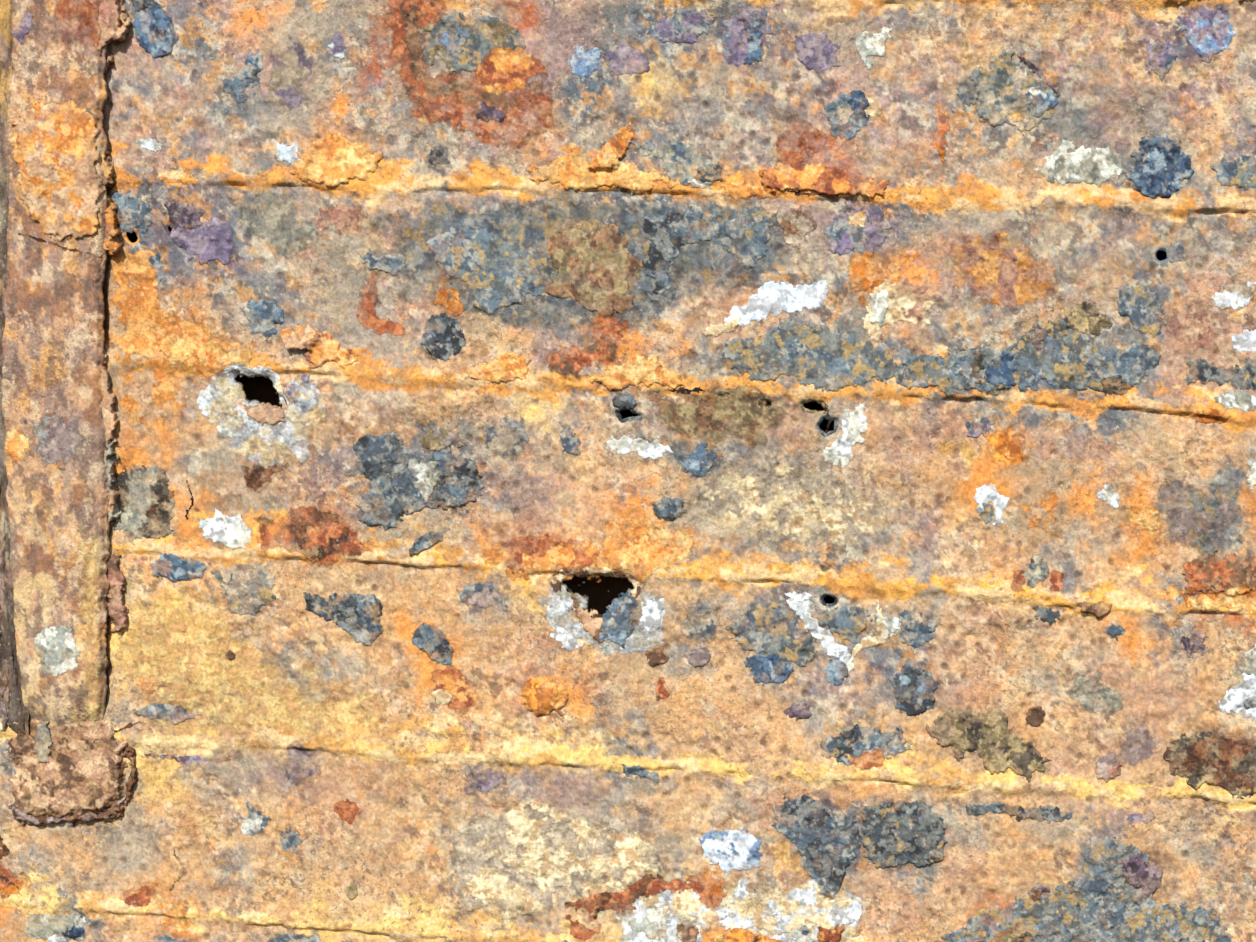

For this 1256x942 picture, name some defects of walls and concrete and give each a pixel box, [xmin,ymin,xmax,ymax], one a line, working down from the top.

rust [384,0,559,148]
rust [526,122,674,197]
rust [721,118,890,200]
rust [6,100,261,526]
rust [280,322,359,371]
rust [544,219,788,448]
rust [257,506,371,566]
rust [483,517,697,583]
rust [1178,547,1256,614]
rust [926,707,1052,783]
rust [1163,730,1256,799]
rust [817,924,845,942]